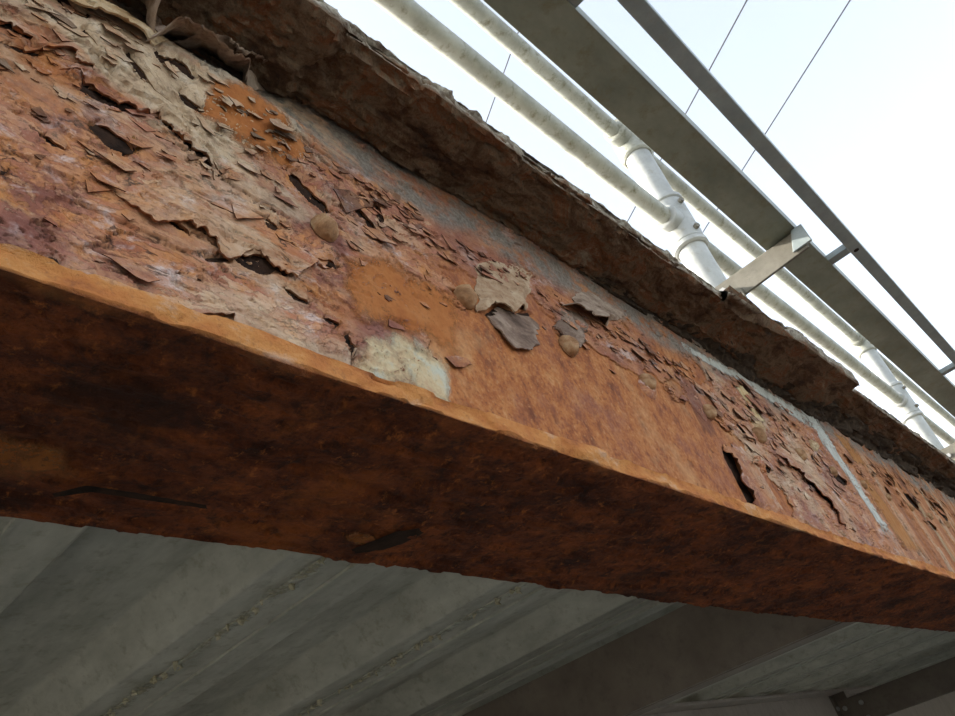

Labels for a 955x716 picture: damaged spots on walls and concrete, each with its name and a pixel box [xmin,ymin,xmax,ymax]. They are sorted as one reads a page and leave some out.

peeling [0,0,331,277]
peeling [178,278,360,365]
peeling [345,257,458,350]
peeling [474,261,540,351]
peeling [552,291,625,348]
rust [560,260,955,499]
rust [0,436,67,478]
peeling [736,418,868,531]
rust [865,480,919,549]
peeling [881,462,937,530]